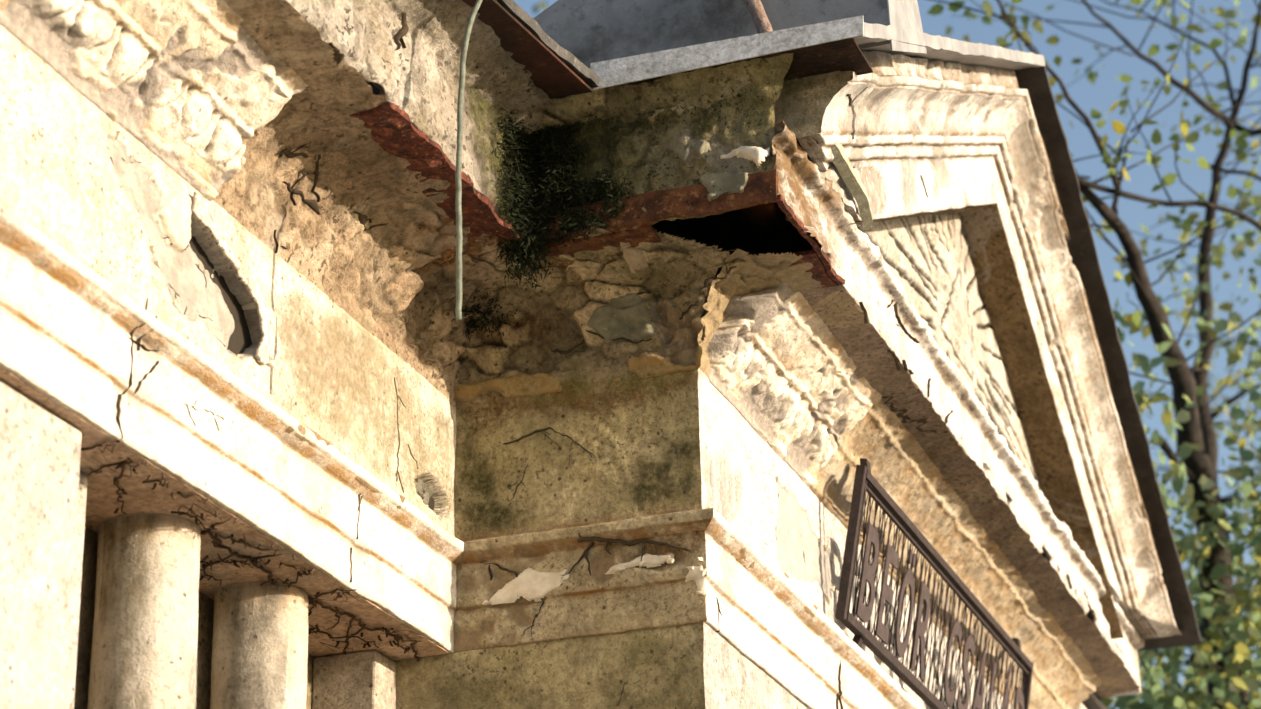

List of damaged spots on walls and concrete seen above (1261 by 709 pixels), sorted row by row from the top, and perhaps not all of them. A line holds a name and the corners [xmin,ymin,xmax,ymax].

crack [275,144,321,215]
flaking render [107,131,281,367]
crack [274,230,287,253]
crack [353,211,389,231]
flaking render [622,245,649,273]
crack [115,237,213,443]
spalling [653,299,705,357]
crack [349,377,418,583]
spalling [397,476,444,513]
crack [480,562,544,636]
peeling [482,567,570,605]
peeling [605,553,708,597]